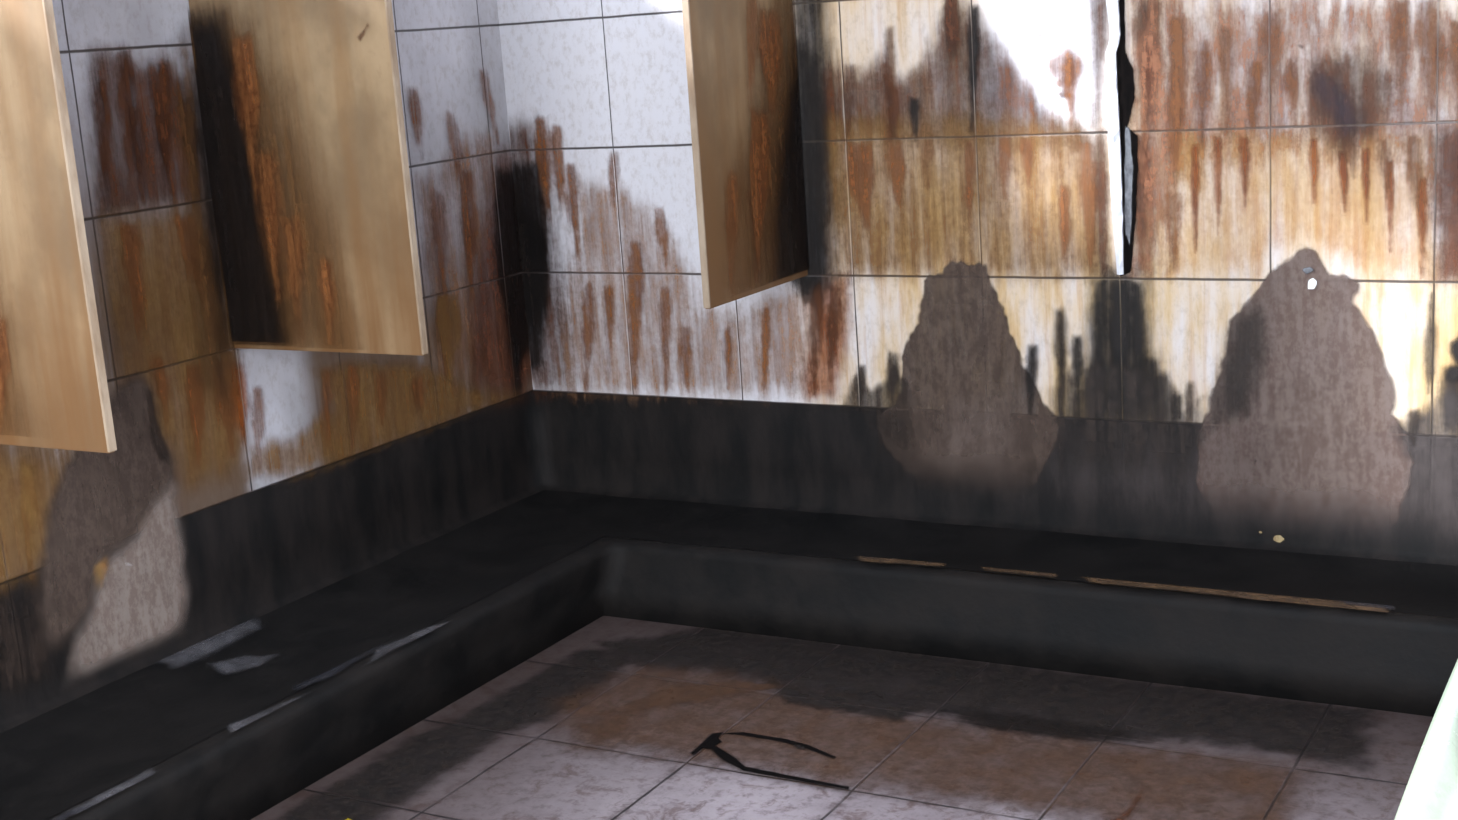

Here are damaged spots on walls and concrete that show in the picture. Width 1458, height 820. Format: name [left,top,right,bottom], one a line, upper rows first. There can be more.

corrosion [91,51,193,211]
corrosion [1133,0,1458,277]
damp [856,366,865,400]
damp [877,261,1060,475]
damp [1055,248,1419,511]
spalling [1303,267,1317,289]